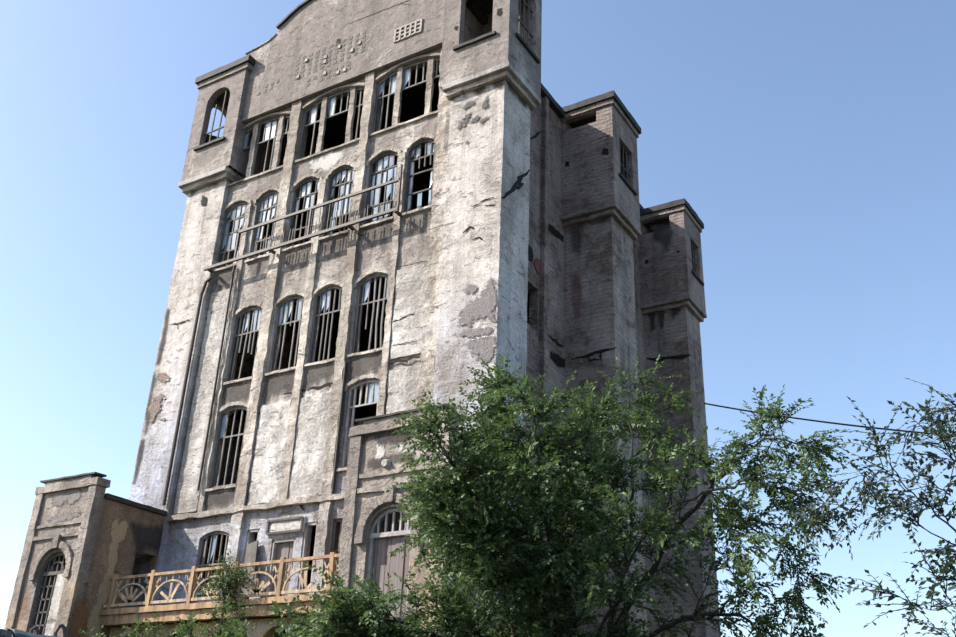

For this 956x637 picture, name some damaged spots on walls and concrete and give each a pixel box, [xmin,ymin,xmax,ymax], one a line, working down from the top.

peeling [457,97,490,130]
crack [463,169,530,240]
spalling [455,277,500,363]
peeling [86,516,129,637]